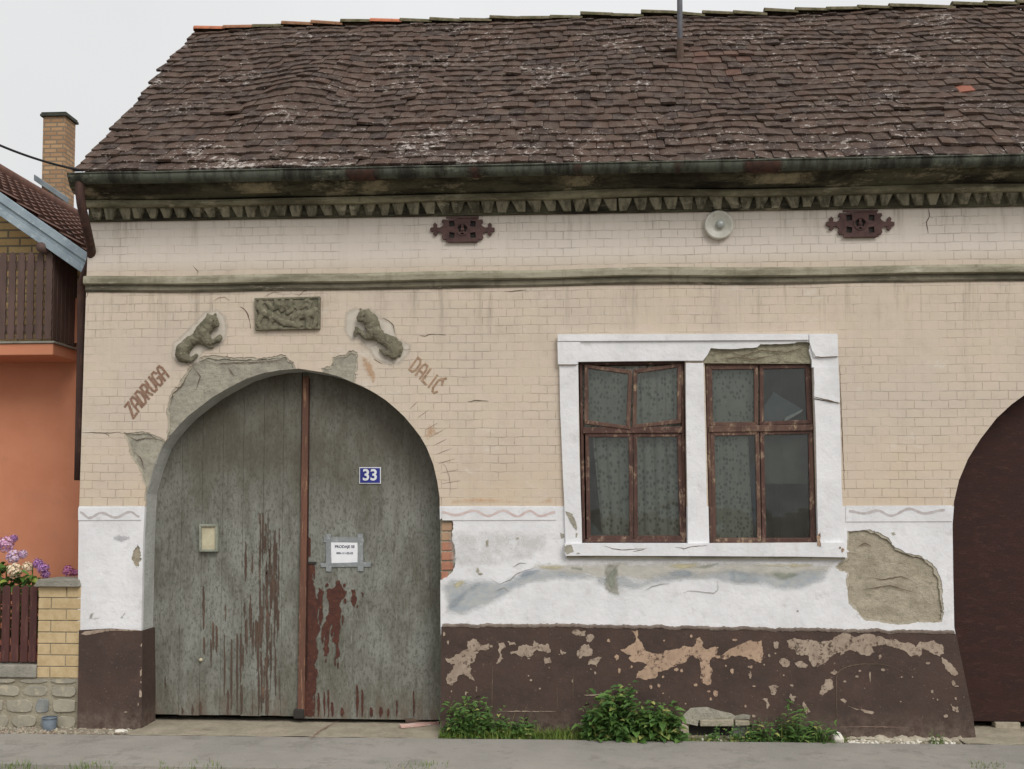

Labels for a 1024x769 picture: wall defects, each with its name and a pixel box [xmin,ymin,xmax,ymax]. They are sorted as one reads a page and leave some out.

flaking render [440,519,456,580]
leakage [447,563,827,613]
peeling [443,629,959,742]